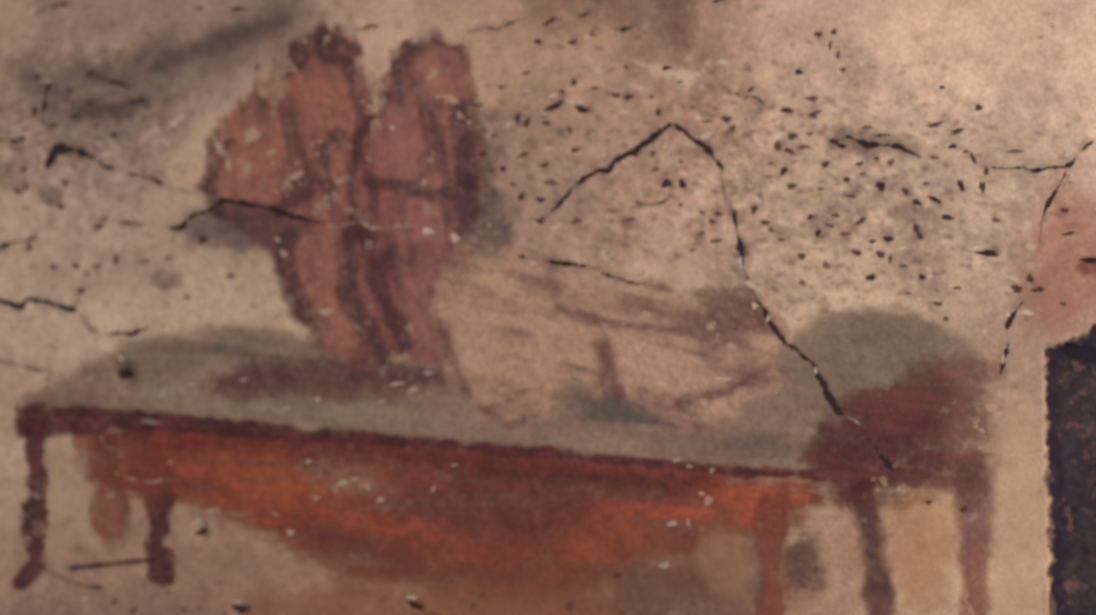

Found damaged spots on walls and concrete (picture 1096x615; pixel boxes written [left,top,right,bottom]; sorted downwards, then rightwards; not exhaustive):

crack [0,80,162,186]
crack [542,123,723,219]
crack [993,137,1093,213]
crack [169,198,323,230]
crack [423,228,459,242]
crack [520,255,638,284]
crack [0,289,87,318]
crack [732,212,843,415]
crack [113,328,143,336]
crack [1000,310,1032,373]
crack [876,448,893,471]